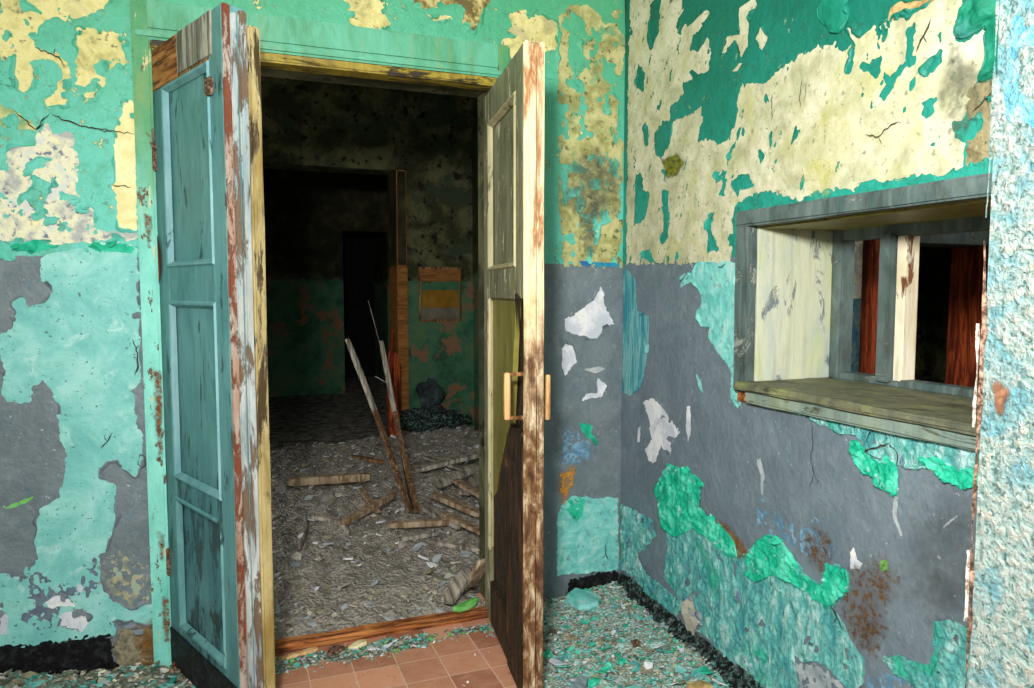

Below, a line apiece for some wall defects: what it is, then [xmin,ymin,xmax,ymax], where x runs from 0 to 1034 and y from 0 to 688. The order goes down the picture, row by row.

peeling [0,0,130,109]
peeling [344,0,391,30]
peeling [410,0,491,35]
water stain [950,59,968,94]
water stain [568,157,616,254]
peeling [501,0,1034,408]
peeling [0,98,154,666]
peeling [786,241,988,688]
peeling [557,436,865,688]
corrosion [843,564,896,652]